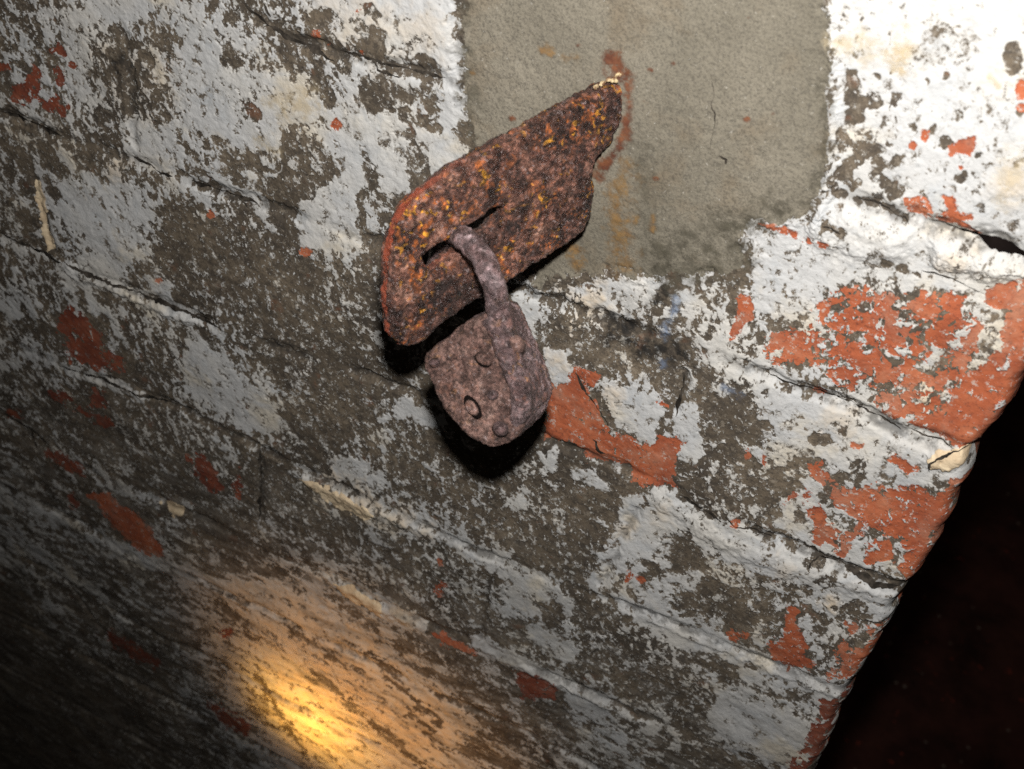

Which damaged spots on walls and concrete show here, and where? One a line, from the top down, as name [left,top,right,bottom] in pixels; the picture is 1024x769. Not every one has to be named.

peeling [0,0,77,118]
peeling [97,24,183,152]
peeling [241,90,262,133]
peeling [281,5,464,143]
corrosion [593,51,632,181]
crack [858,197,1024,256]
peeling [0,118,1024,580]
crack [768,372,971,472]
crack [683,496,772,536]
peeling [333,583,382,618]
peeling [0,576,251,769]